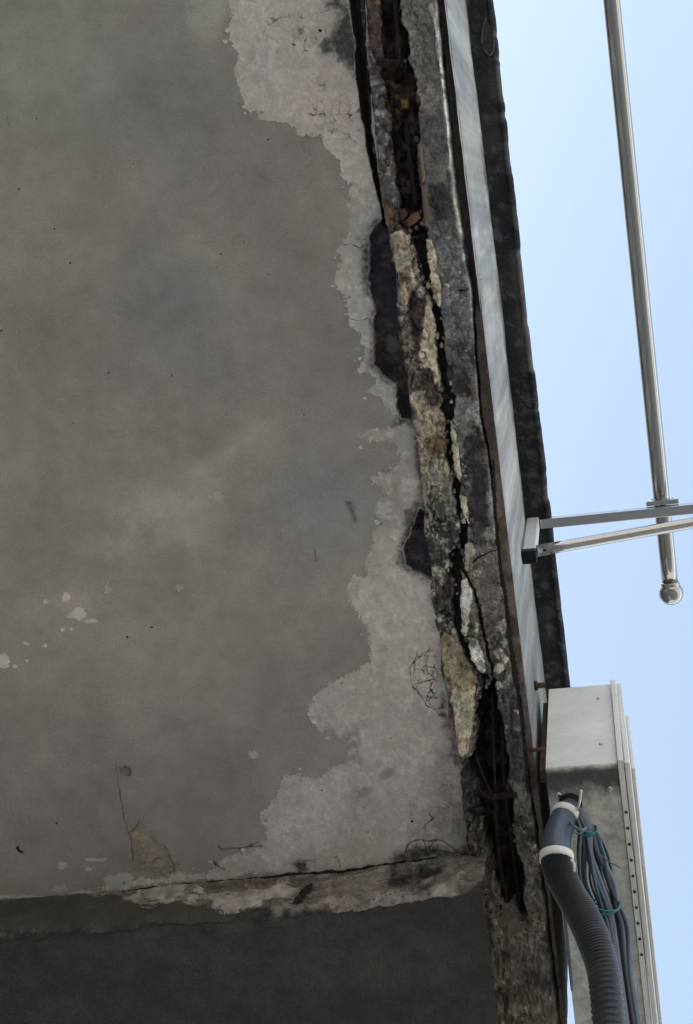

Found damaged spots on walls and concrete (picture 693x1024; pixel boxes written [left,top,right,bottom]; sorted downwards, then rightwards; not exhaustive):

peeling [0,0,527,922]
crack [409,233,530,791]
crack [120,795,475,891]